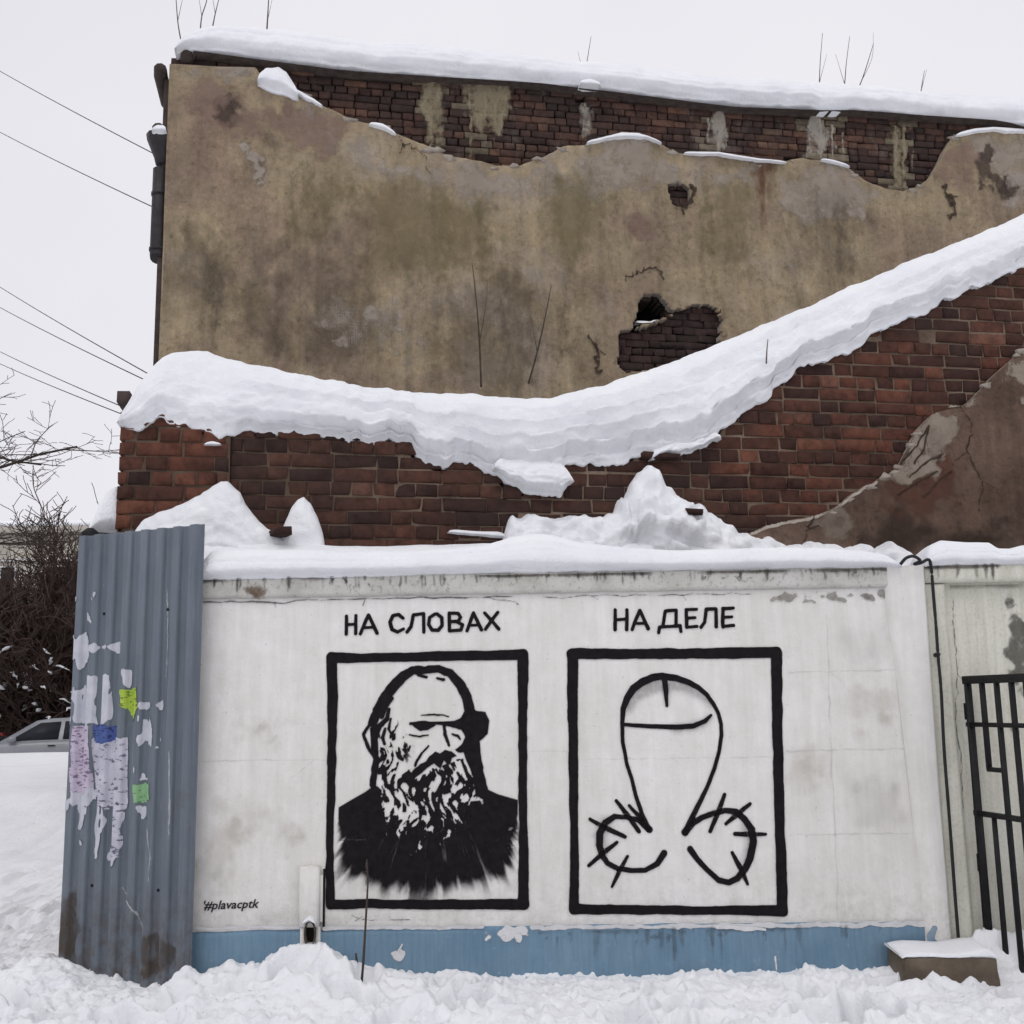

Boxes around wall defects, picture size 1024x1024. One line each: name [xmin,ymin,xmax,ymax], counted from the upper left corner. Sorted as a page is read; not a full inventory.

spalling [284,70,1024,222]
crack [625,266,665,281]
crack [587,335,605,373]
spalling [617,297,727,373]
crack [954,405,998,512]